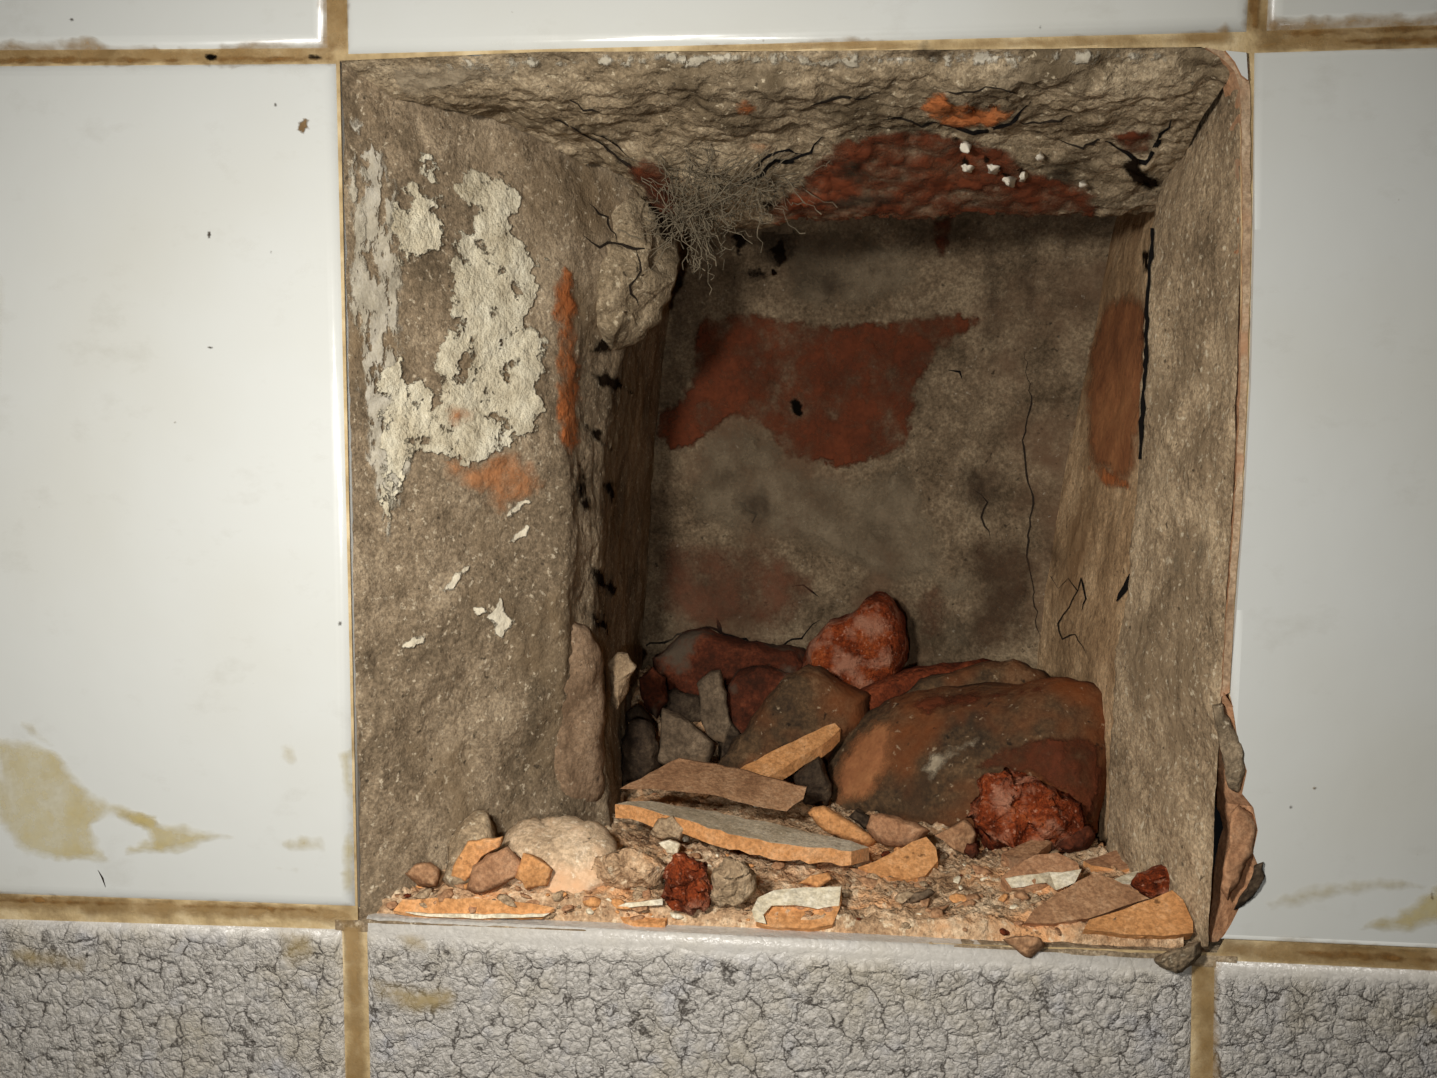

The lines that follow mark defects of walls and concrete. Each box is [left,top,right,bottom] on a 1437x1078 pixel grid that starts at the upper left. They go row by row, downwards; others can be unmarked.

crack [550,99,632,169]
peeling [598,53,912,68]
spalling [773,93,1095,254]
crack [734,86,1171,187]
crack [583,203,653,306]
peeling [349,122,633,543]
spalling [657,313,978,468]
spalling [1087,298,1143,488]
crack [1138,228,1154,459]
peeling [473,598,514,638]
leakage [133,816,191,849]
spalling [1208,693,1265,942]